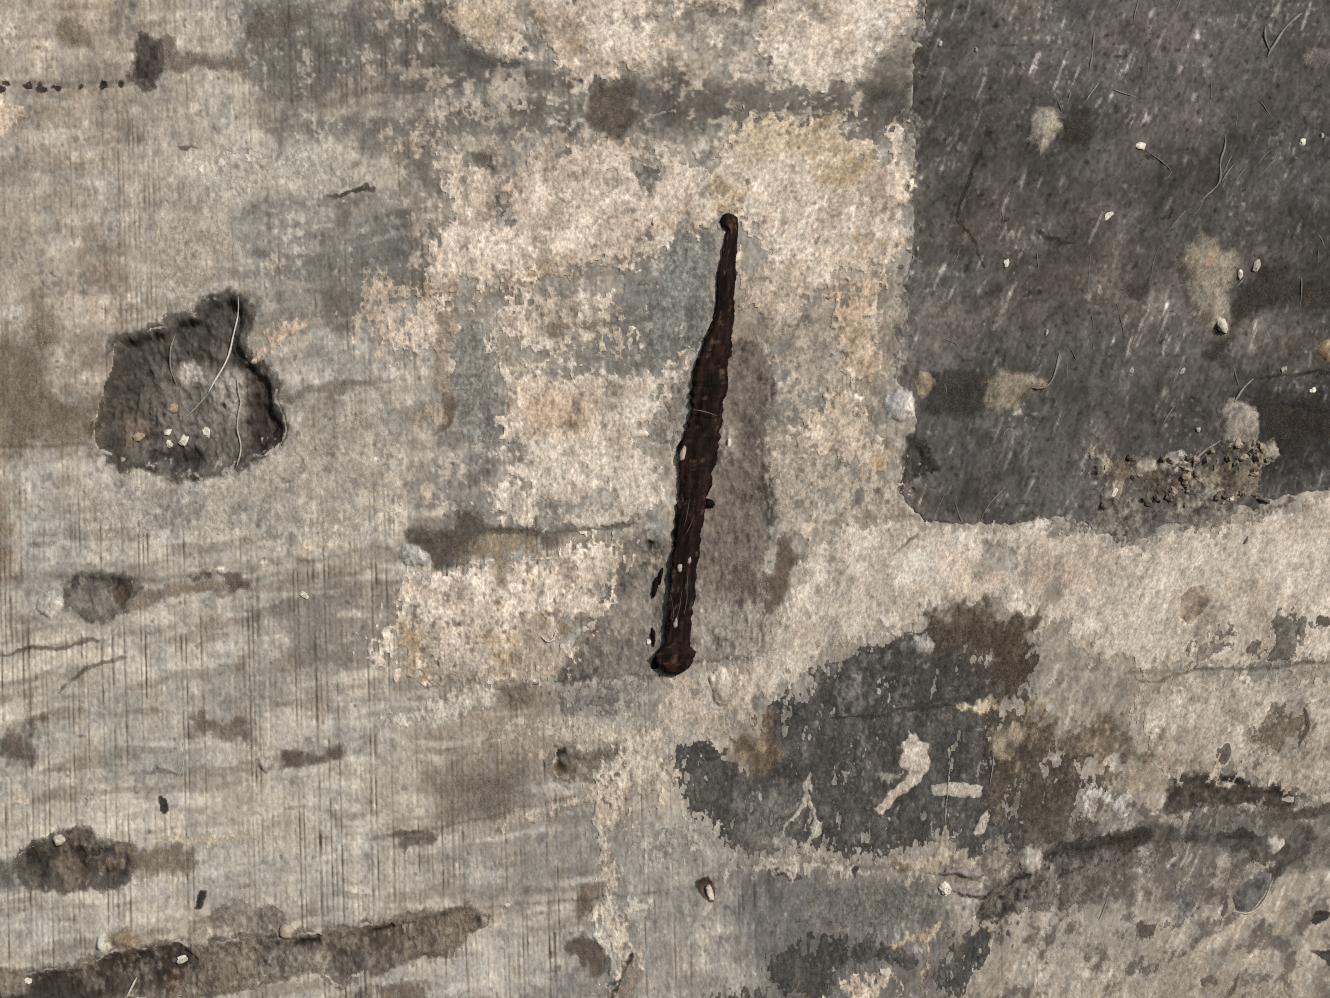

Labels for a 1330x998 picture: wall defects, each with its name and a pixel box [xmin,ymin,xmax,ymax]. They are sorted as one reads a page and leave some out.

hole [90,288,289,484]
hole [900,434,940,492]
spalling [1045,434,1308,549]
spalling [63,571,142,623]
corrosion [652,567,663,598]
corrosion [651,627,659,669]
peeling [670,607,1330,998]
hole [16,825,133,895]
spalling [177,902,292,964]